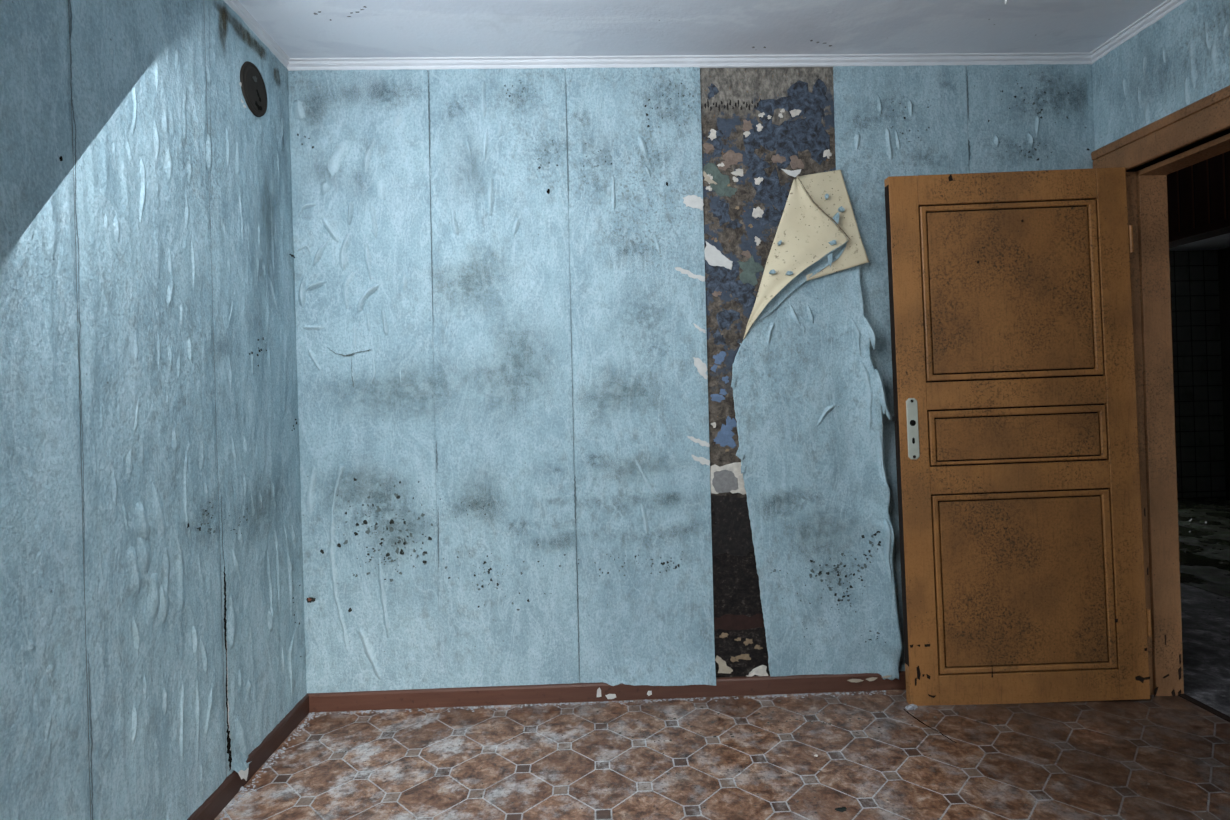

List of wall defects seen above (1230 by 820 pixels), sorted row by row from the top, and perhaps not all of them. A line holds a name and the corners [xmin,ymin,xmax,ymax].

leakage [219,7,265,57]
flaking render [700,67,836,678]
mould [320,481,441,582]
mould [443,551,530,611]
mould [771,531,881,620]
crack [221,496,232,770]